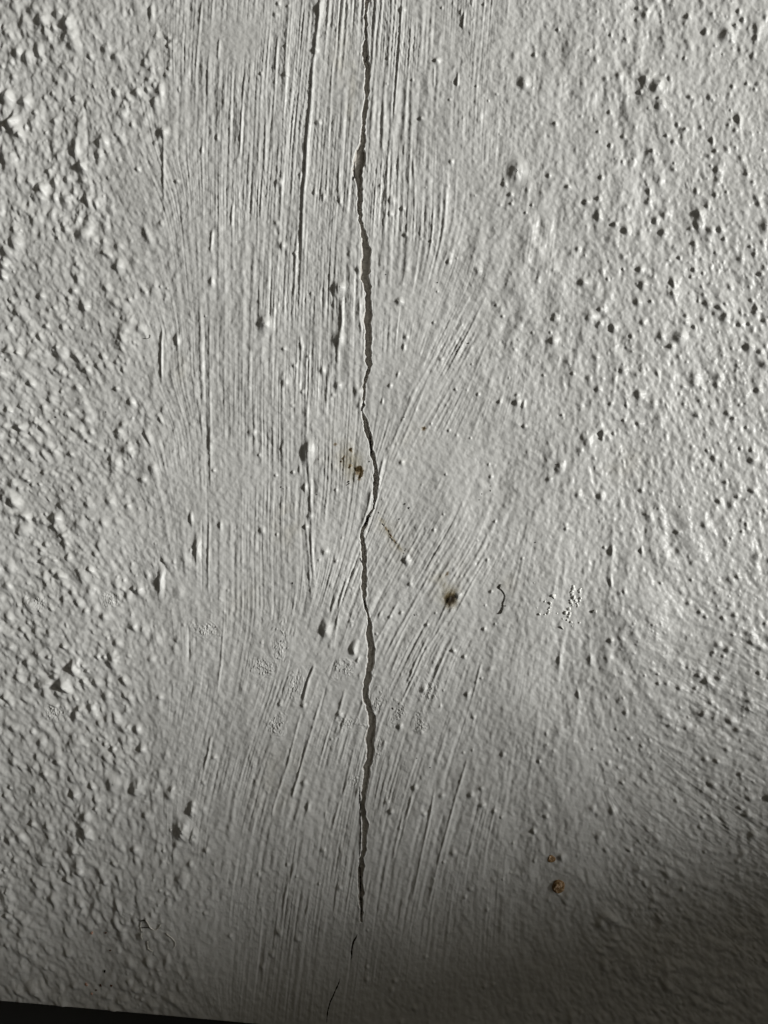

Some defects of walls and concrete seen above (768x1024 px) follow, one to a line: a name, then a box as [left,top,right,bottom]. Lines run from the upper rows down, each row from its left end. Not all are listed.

corrosion [340,448,364,485]
crack [326,0,405,1020]